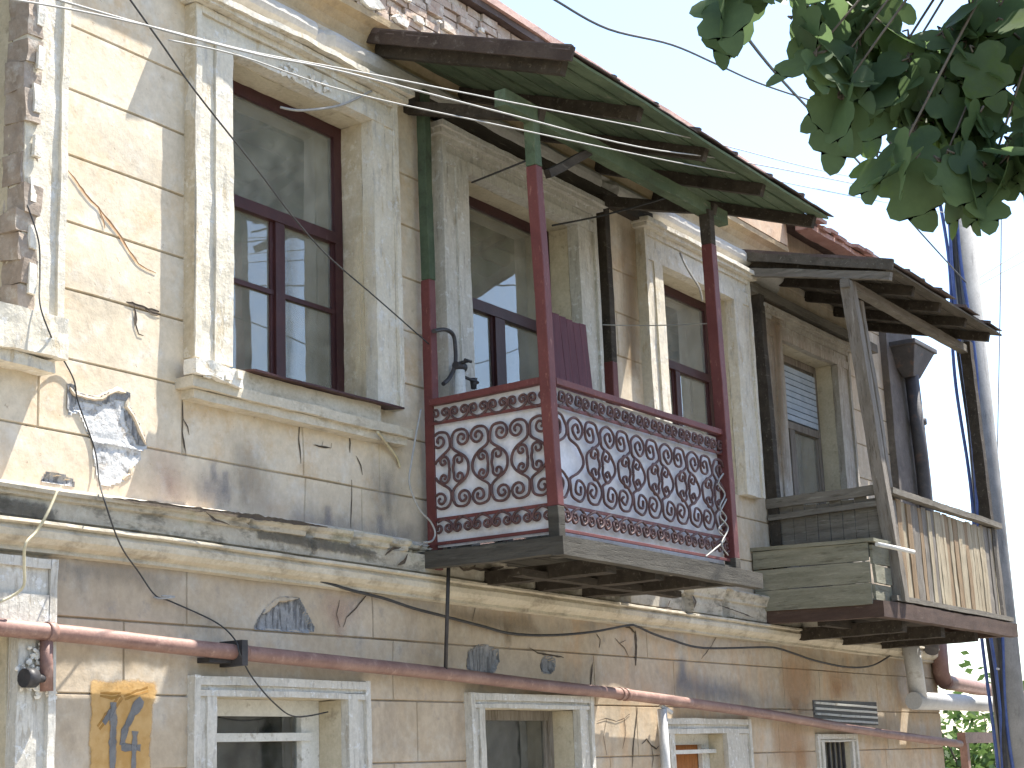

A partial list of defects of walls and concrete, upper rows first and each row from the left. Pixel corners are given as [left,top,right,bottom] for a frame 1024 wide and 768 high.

crack [68,171,156,273]
crack [126,301,161,336]
flaking render [67,383,147,486]
crack [181,400,189,452]
flaking render [42,472,75,487]
leakage [0,498,55,521]
leakage [258,531,376,555]
spalling [254,596,315,633]
spalling [466,644,500,673]
spalling [540,656,556,674]
crack [599,708,659,768]